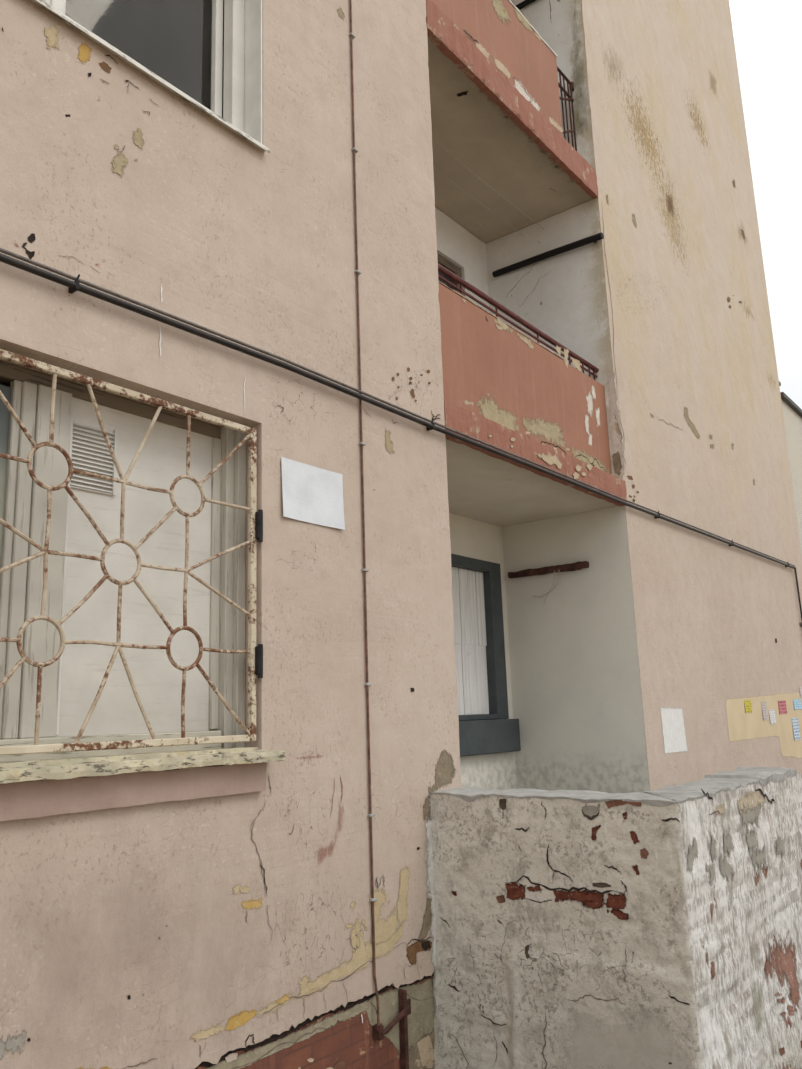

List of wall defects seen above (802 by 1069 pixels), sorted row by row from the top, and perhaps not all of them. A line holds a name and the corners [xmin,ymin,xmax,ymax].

peeling [78,43,118,84]
flaking render [464,30,563,132]
peeling [556,345,581,371]
peeling [463,393,570,469]
flaking render [422,749,457,820]
crack [250,778,324,943]
crack [515,827,572,881]
flaking render [495,875,629,920]
peeling [189,866,435,1069]
crack [245,942,411,1044]
crack [440,917,635,1069]
flaking render [764,931,801,1029]